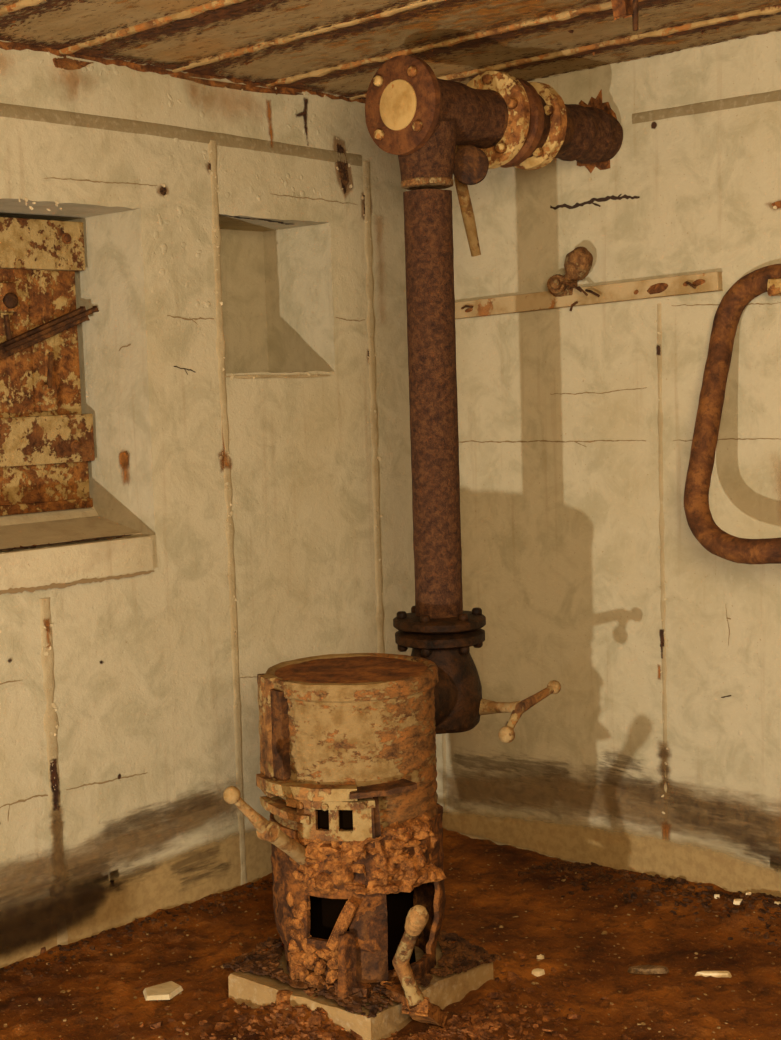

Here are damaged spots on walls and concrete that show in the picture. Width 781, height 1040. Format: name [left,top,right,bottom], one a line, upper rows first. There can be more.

corrosion [0,0,781,145]
crack [550,194,640,210]
corrosion [634,283,668,295]
corrosion [119,452,129,482]
corrosion [50,759,65,896]
leakage [0,794,272,968]
leakage [442,772,781,897]